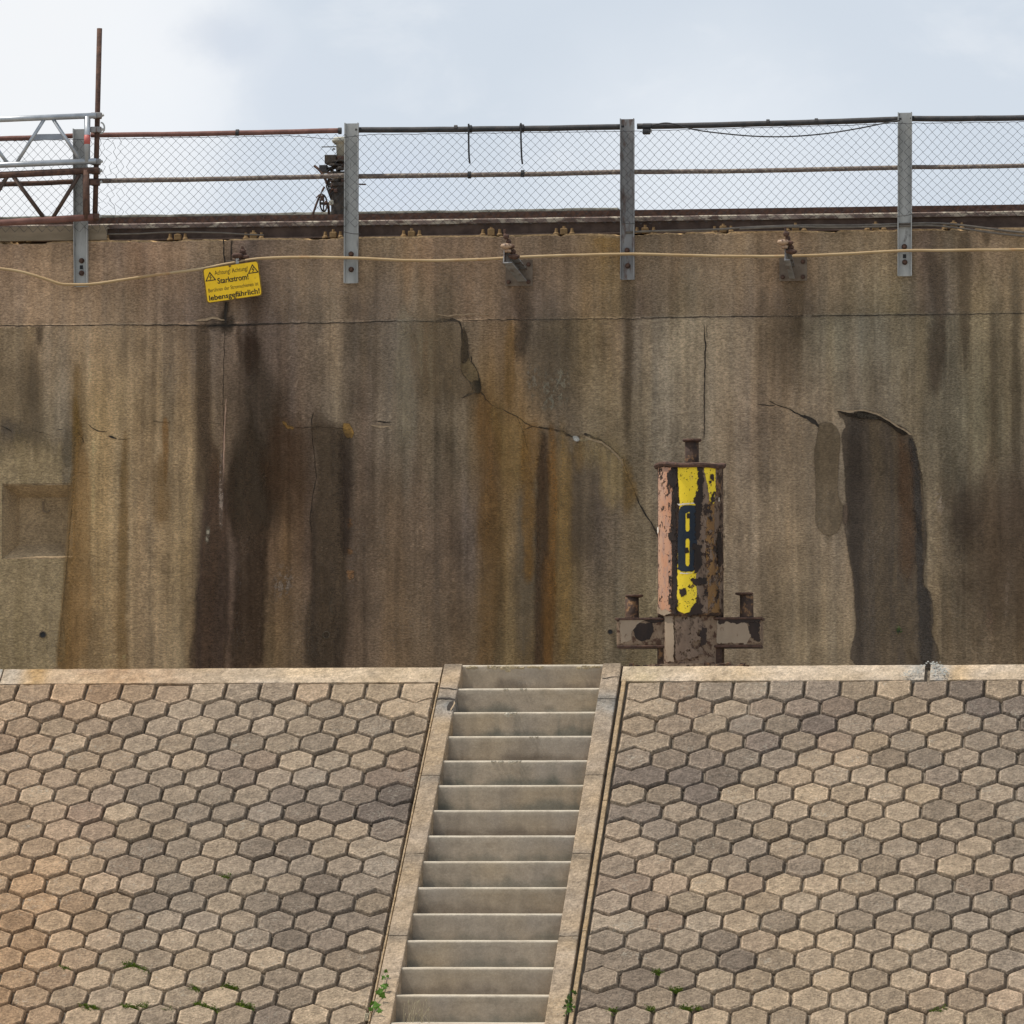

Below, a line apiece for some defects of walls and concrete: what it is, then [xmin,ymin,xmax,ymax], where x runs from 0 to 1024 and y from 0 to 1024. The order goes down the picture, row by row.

water stain [189,303,295,669]
water stain [306,420,351,668]
crack [0,301,1021,538]
corrosion [545,428,571,665]
corrosion [645,467,761,646]
spalling [836,409,911,435]
water stain [814,411,940,668]